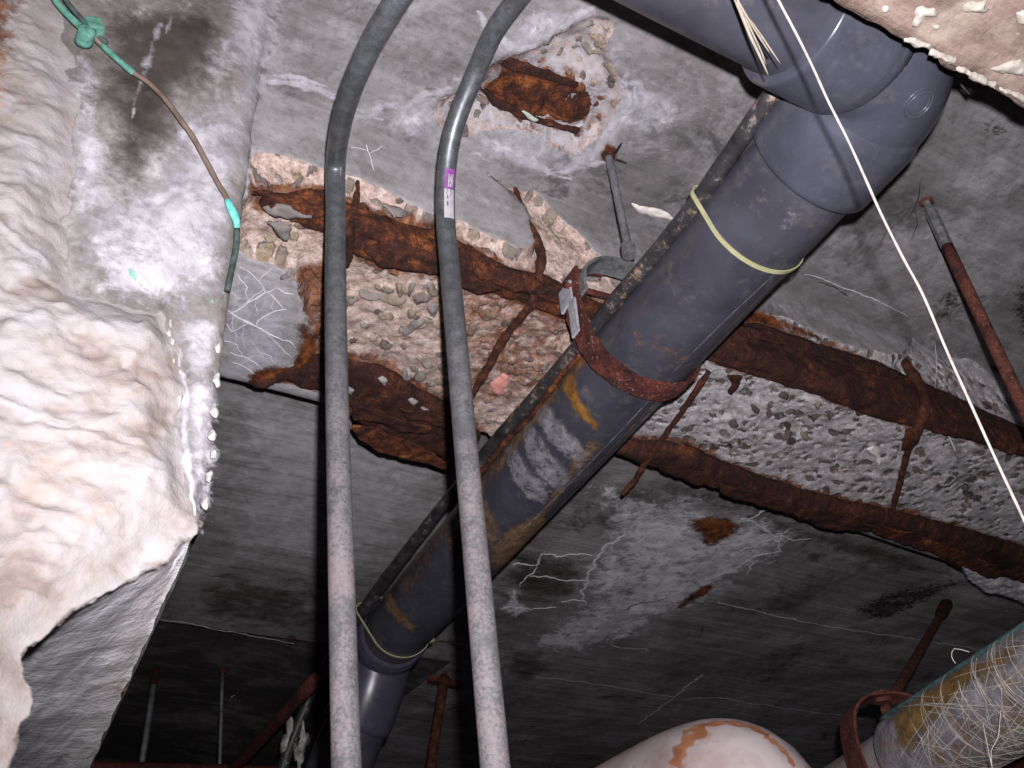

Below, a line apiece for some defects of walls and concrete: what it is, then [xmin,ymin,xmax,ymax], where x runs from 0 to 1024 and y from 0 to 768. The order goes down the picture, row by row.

rust [480,55,594,134]
damp [0,0,337,768]
crack [226,267,296,374]
spalling [239,150,325,365]
spalling [346,253,450,405]
rust [457,220,566,400]
spalling [462,288,574,436]
rust [614,311,1024,583]
spalling [629,359,1024,546]
damp [499,555,572,617]
crack [513,534,626,609]
damp [510,486,788,676]